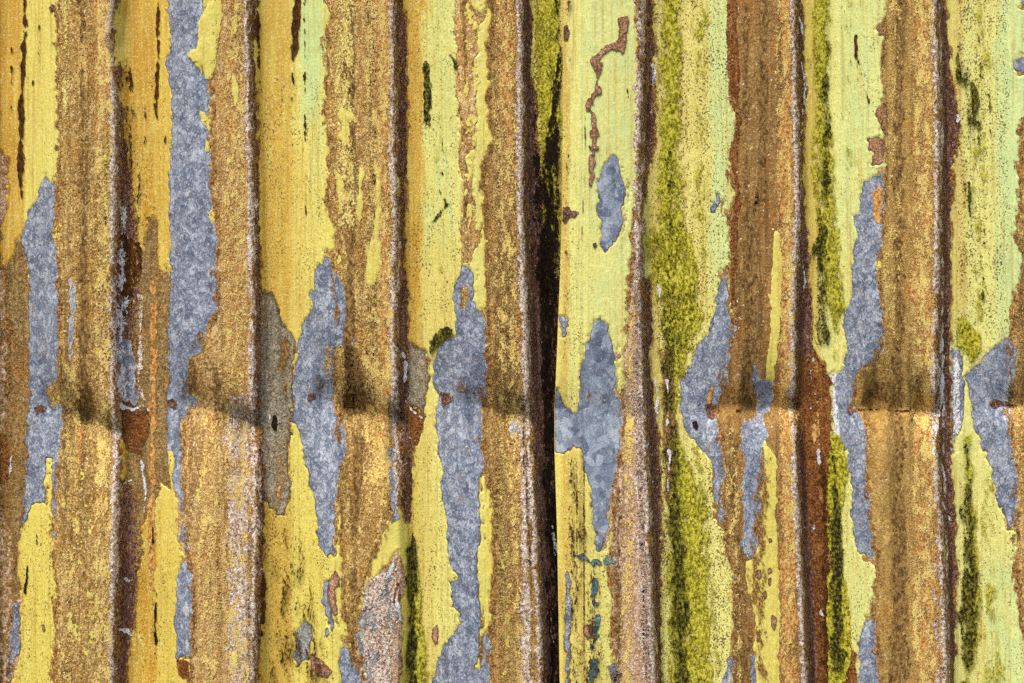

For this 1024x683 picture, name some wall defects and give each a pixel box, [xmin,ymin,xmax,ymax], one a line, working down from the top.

peeling [0,174,65,683]
rust [0,0,160,683]
peeling [115,0,223,679]
rust [173,0,270,683]
peeling [256,256,355,556]
rust [320,0,416,683]
peeling [400,0,492,683]
rust [478,0,560,683]
peeling [555,316,624,551]
rust [710,0,858,683]
peeling [830,171,887,561]
rust [846,0,963,683]